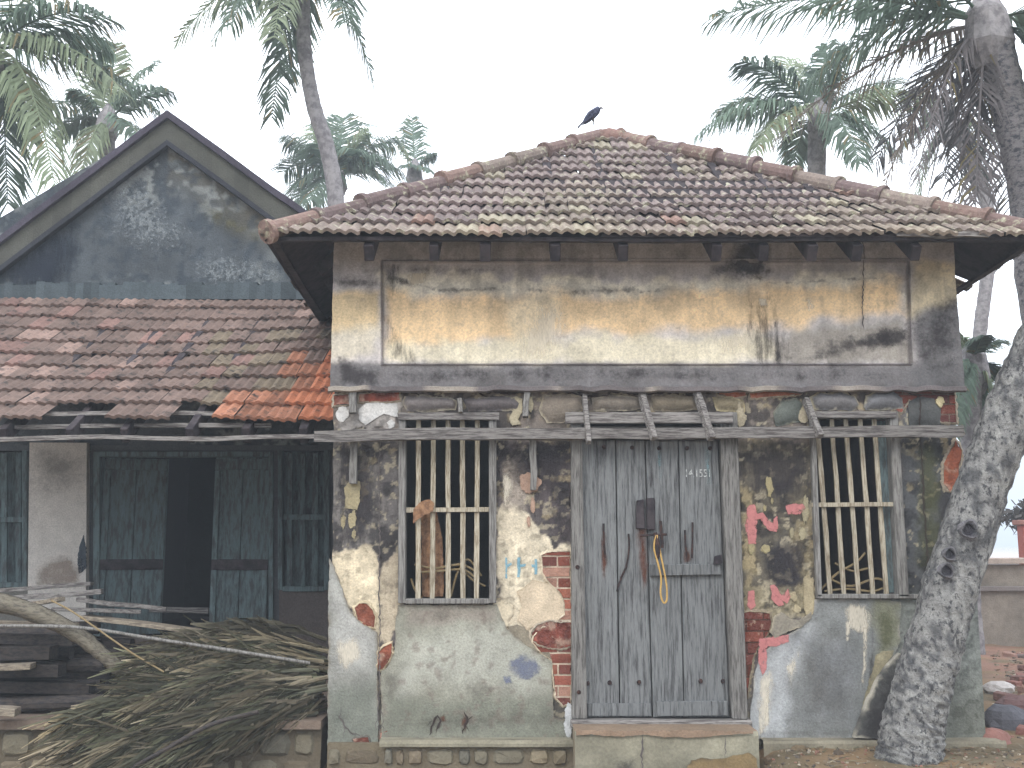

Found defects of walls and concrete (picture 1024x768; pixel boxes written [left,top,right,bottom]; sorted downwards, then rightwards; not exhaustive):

damp [716,243,763,279]
crack [859,242,867,328]
damp [757,323,780,363]
damp [830,330,905,354]
flaking render [331,392,402,429]
flaking render [509,396,533,426]
flaking render [940,438,964,493]
flaking render [763,476,774,511]
flaking render [352,600,378,630]
flaking render [376,641,394,673]
flaking render [498,549,572,737]
flaking render [744,571,815,699]